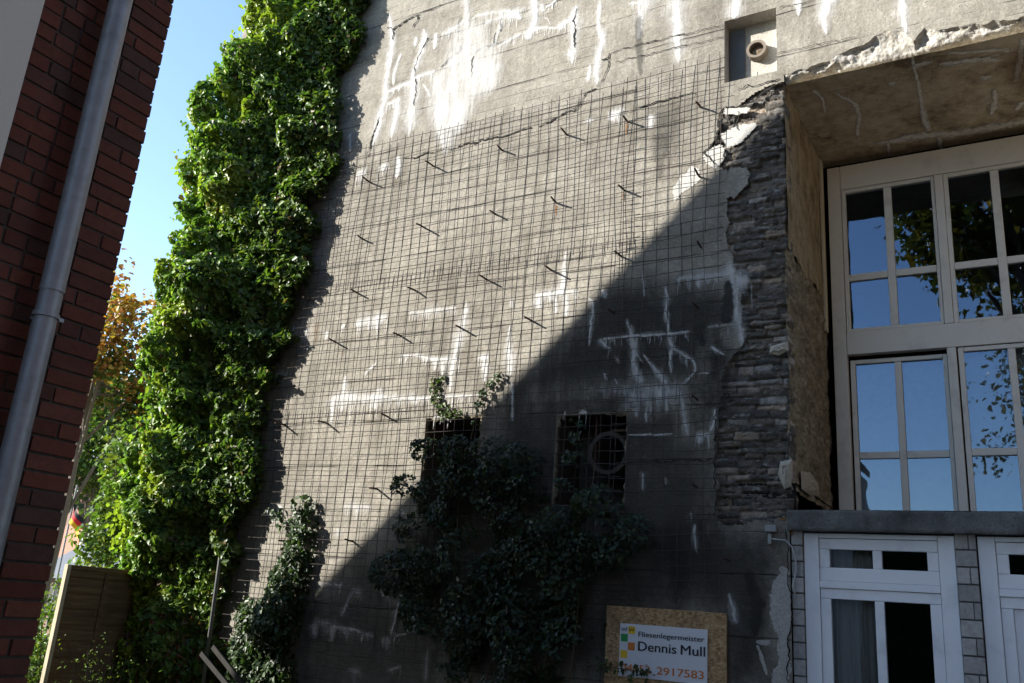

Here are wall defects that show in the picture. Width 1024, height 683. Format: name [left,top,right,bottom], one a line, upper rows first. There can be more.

crack [387,4,512,106]
leakage [373,0,577,143]
crack [404,24,724,159]
leakage [587,4,605,83]
leakage [672,0,680,60]
spalling [672,16,1024,526]